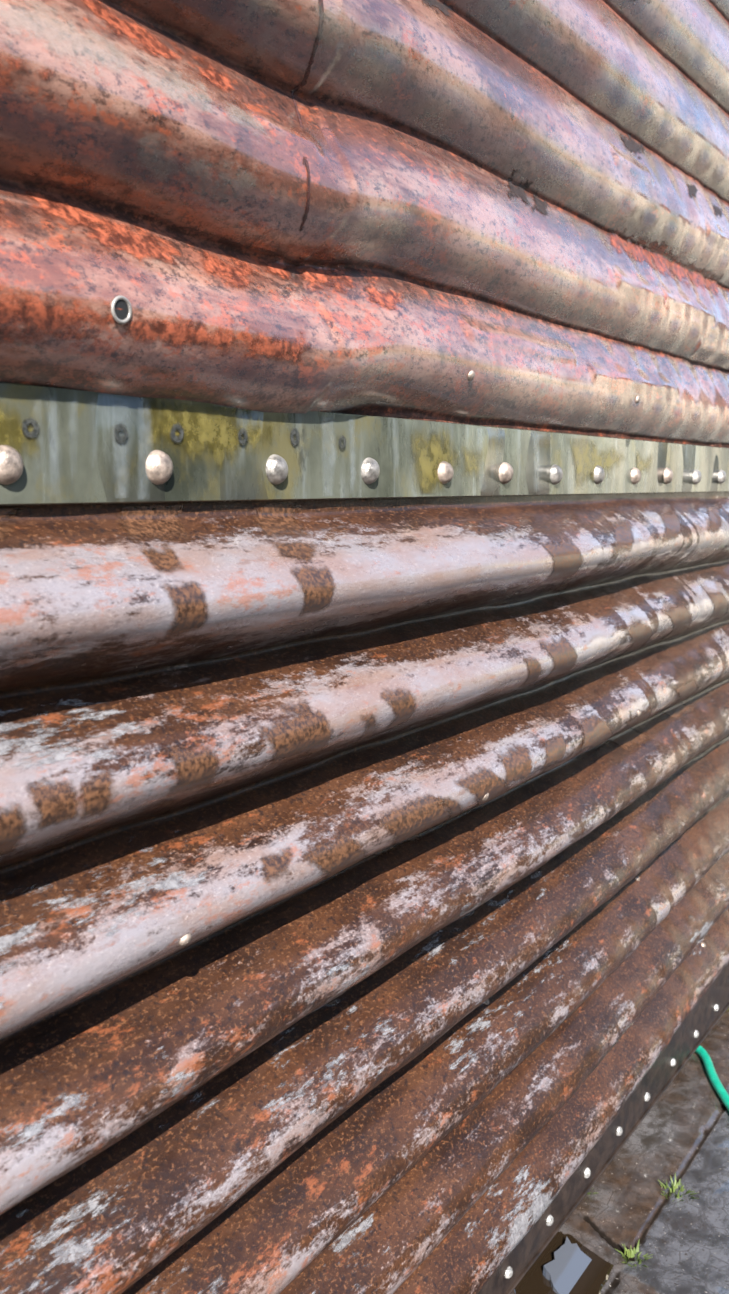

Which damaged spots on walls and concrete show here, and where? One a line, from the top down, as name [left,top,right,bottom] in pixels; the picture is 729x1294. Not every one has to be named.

crack [291,0,324,231]
rust [26,191,180,264]
damp [218,407,250,444]
rust [118,505,208,639]
rust [255,502,335,617]
peeling [0,699,146,768]
rust [0,774,112,854]
rust [260,679,698,882]
peeling [449,996,525,1072]
peeling [1,1192,130,1294]
peeling [334,1214,373,1252]
peeling [484,1166,558,1252]